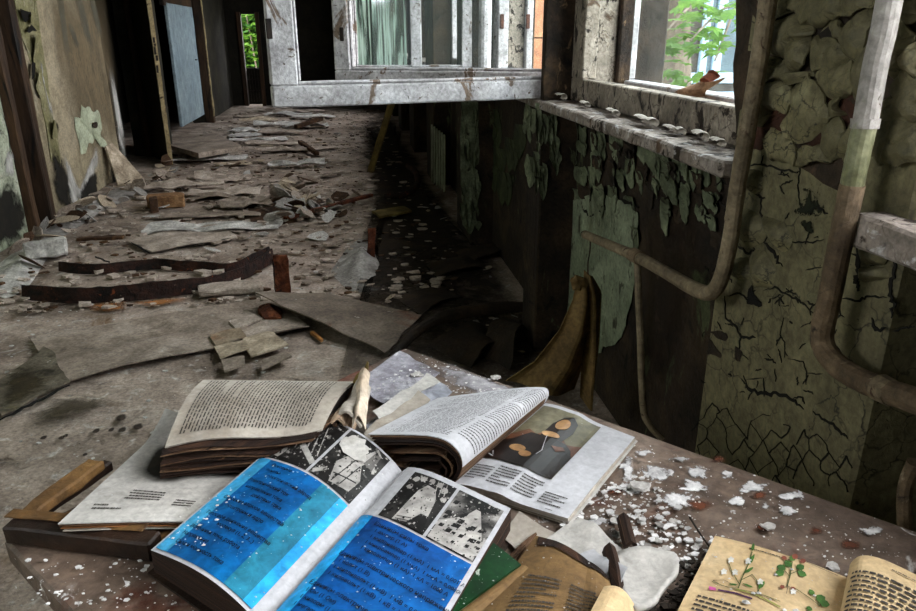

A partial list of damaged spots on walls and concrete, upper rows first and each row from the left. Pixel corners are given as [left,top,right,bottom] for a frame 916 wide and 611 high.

peeling [14,0,61,163]
peeling [74,105,107,154]
peeling [460,101,482,234]
peeling [522,103,562,200]
peeling [567,123,722,353]
crack [691,155,853,492]
crack [835,248,915,353]